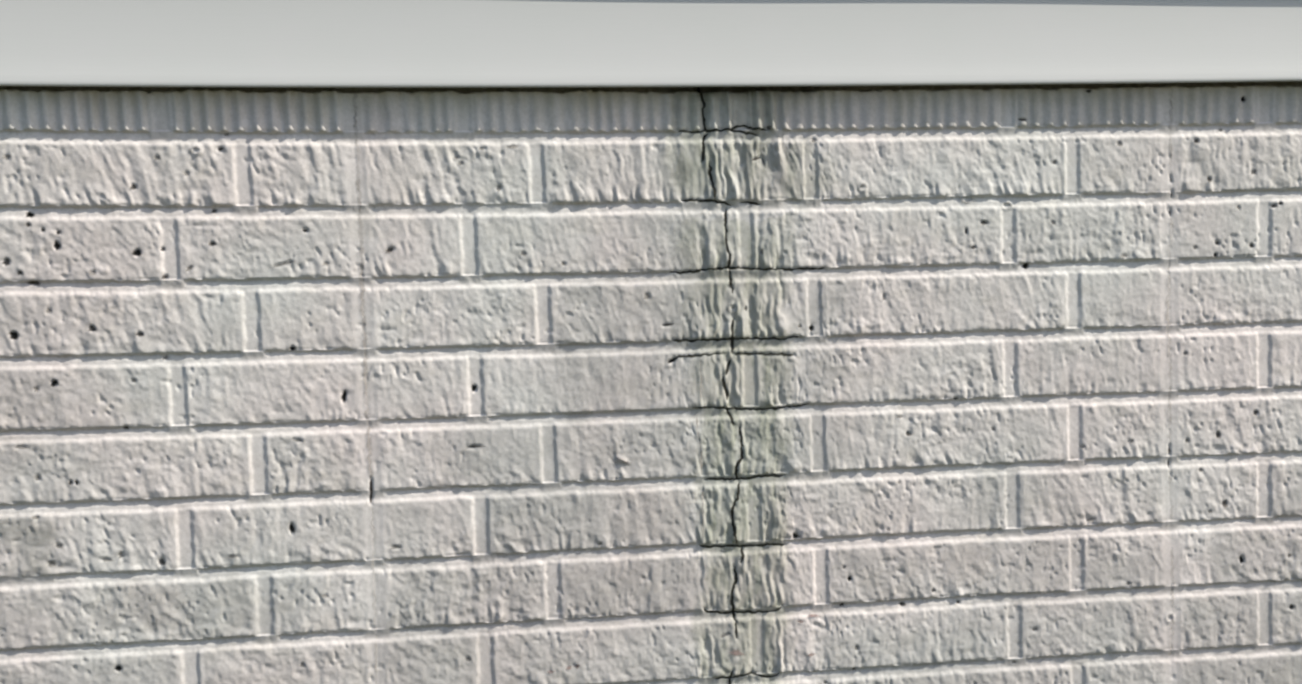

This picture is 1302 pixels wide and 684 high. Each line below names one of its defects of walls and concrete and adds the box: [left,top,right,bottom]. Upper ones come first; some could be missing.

crack [670,87,825,638]
crack [716,671,779,684]